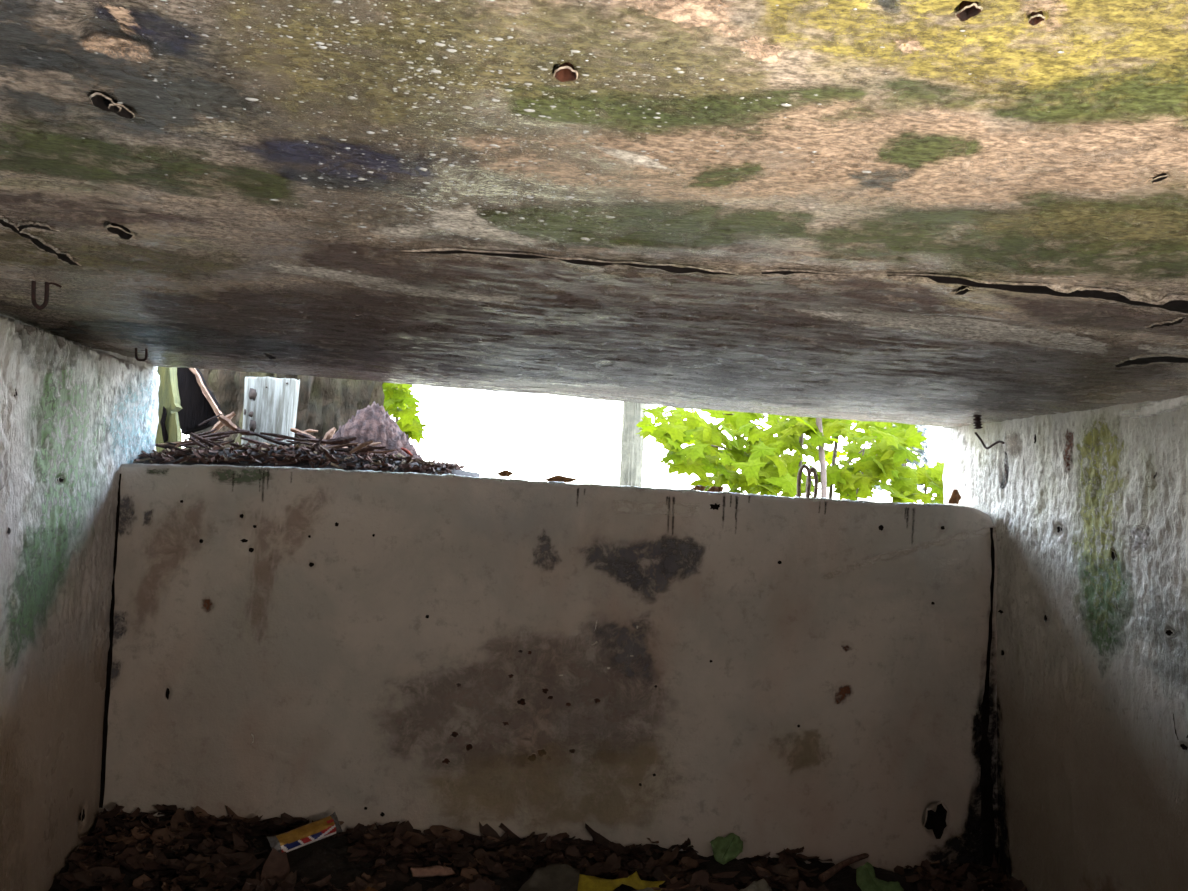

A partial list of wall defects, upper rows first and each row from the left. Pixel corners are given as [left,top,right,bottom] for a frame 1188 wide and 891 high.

spalling [84,2,154,62]
spalling [613,0,782,63]
crack [0,214,82,266]
crack [400,248,853,276]
crack [887,273,1188,367]
leakage [245,466,964,601]
leakage [392,620,659,768]
leakage [927,632,1012,879]